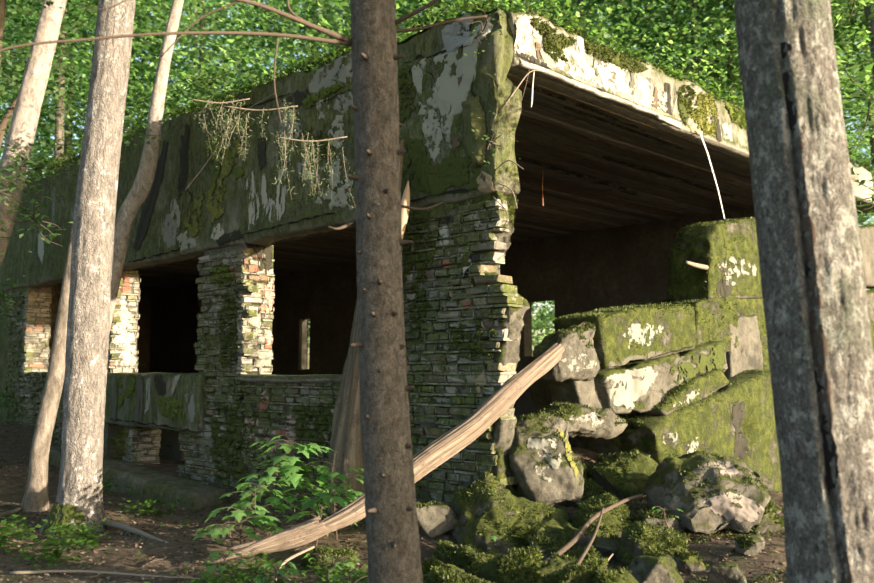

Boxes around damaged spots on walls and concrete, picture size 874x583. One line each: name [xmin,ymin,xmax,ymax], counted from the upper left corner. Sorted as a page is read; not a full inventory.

peeling [411,12,493,162]
peeling [514,23,539,54]
peeling [551,36,668,119]
peeling [308,52,353,211]
peeling [721,123,733,142]
peeling [603,366,658,410]